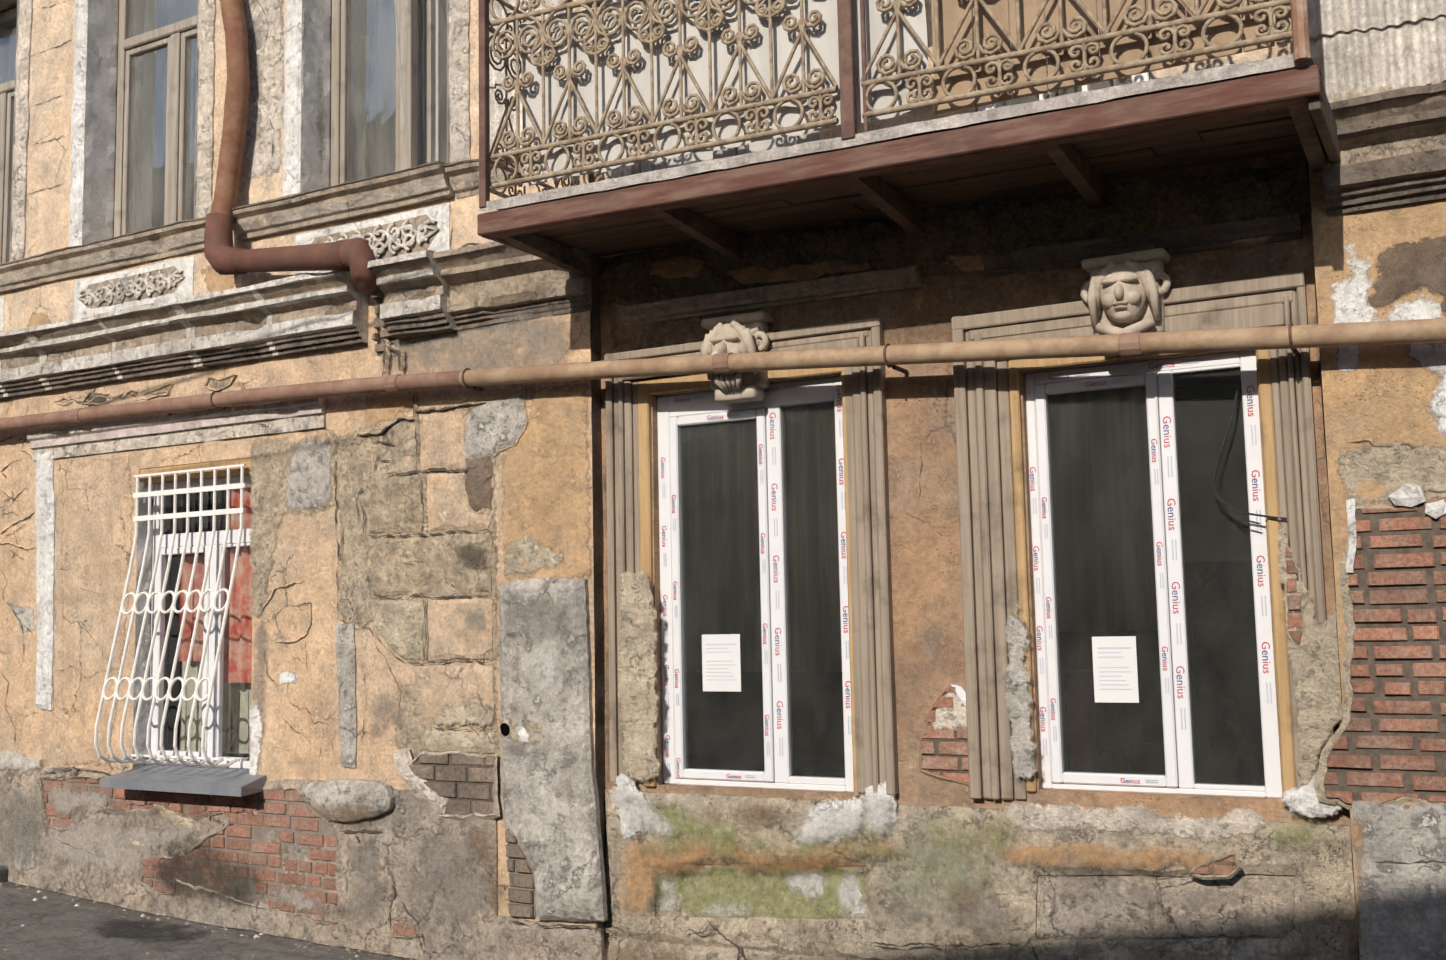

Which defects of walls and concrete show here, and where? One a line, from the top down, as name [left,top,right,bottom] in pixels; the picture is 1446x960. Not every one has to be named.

peeling [1330,236,1446,323]
crack [0,386,173,742]
peeling [38,456,343,926]
water stain [158,849,257,902]
crack [259,297,493,739]
peeling [249,389,564,918]
peeling [614,570,660,839]
water stain [662,877,679,911]
water stain [787,872,859,910]
water stain [798,793,890,844]
flaking render [910,682,969,786]
flaking render [1277,343,1446,818]